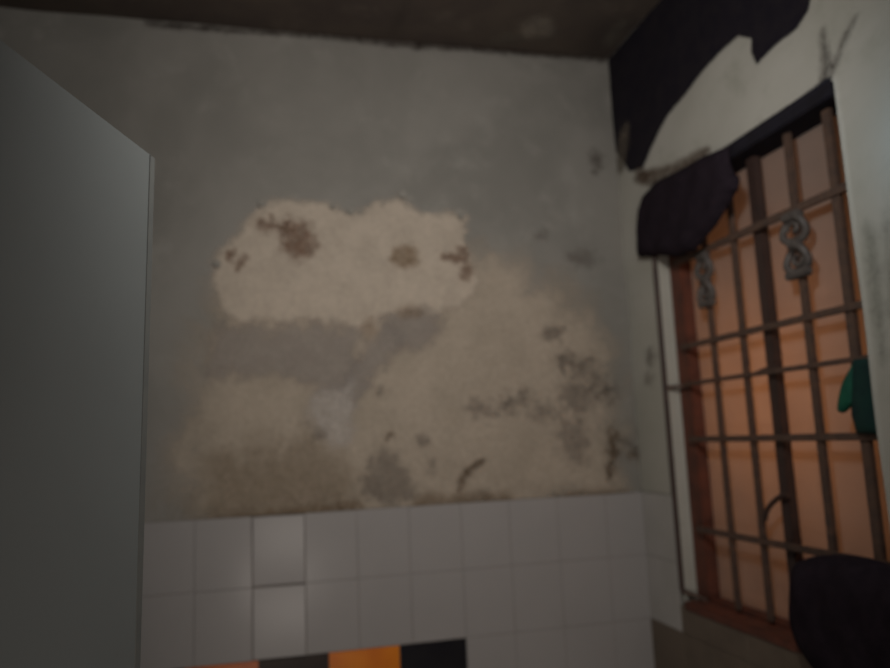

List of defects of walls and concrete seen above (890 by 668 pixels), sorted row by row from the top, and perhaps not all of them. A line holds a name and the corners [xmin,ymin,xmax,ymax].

peeling [608,0,810,173]
peeling [171,190,625,518]